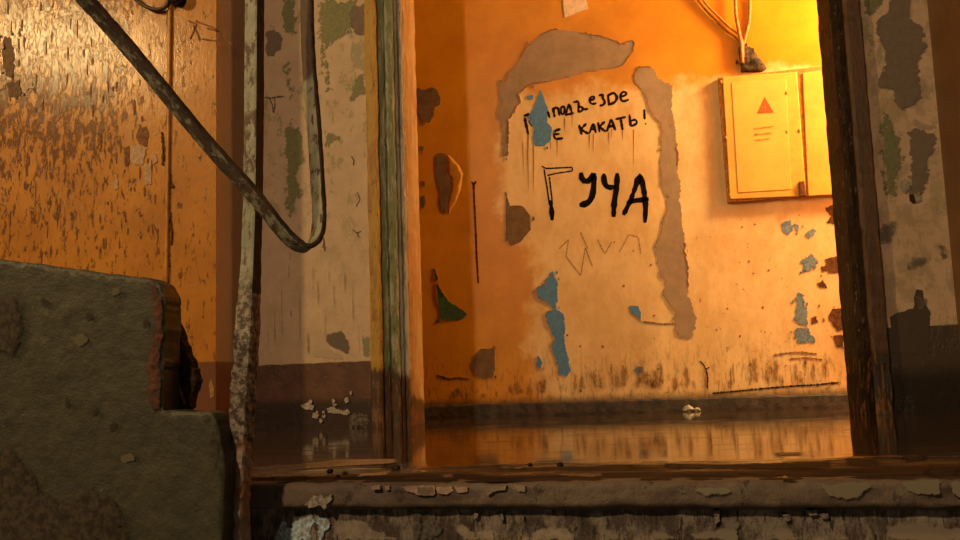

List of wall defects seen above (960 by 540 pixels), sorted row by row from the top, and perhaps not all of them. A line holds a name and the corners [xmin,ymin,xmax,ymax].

peeling [0,2,37,101]
peeling [316,0,364,92]
peeling [417,87,441,125]
peeling [498,28,635,160]
peeling [864,0,927,110]
peeling [284,123,304,217]
peeling [505,193,535,246]
peeling [634,66,697,340]
peeling [879,112,937,204]
peeling [535,271,571,377]
peeling [789,292,820,344]
peeling [663,452,833,479]